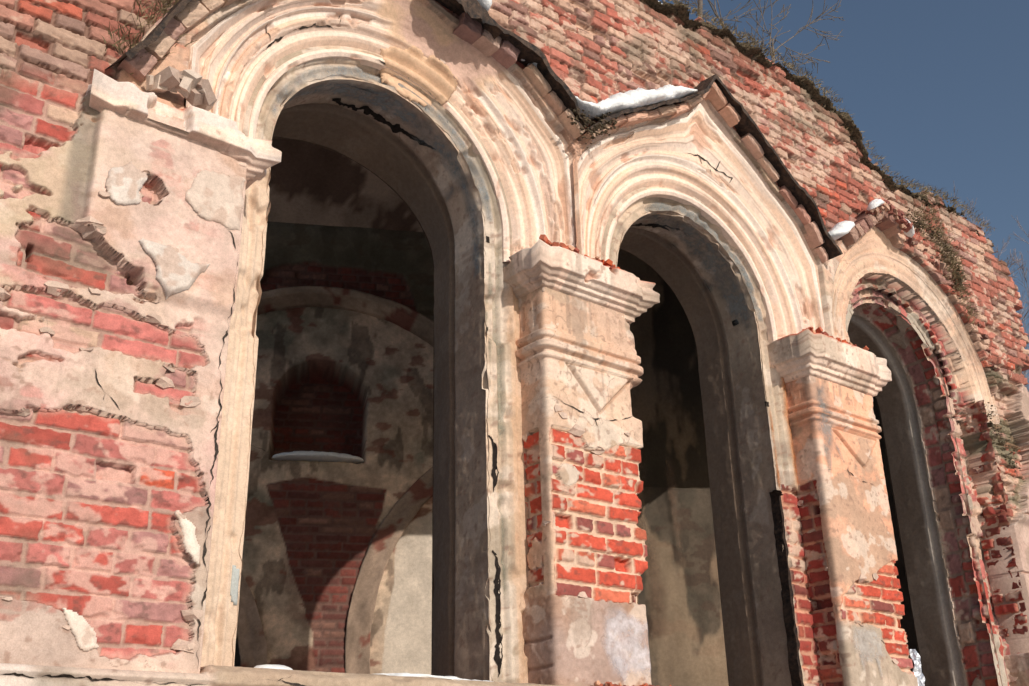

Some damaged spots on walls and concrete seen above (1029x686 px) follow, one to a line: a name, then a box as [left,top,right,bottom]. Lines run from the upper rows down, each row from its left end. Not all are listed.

flaking render [0,216,211,407]
flaking render [0,404,208,659]